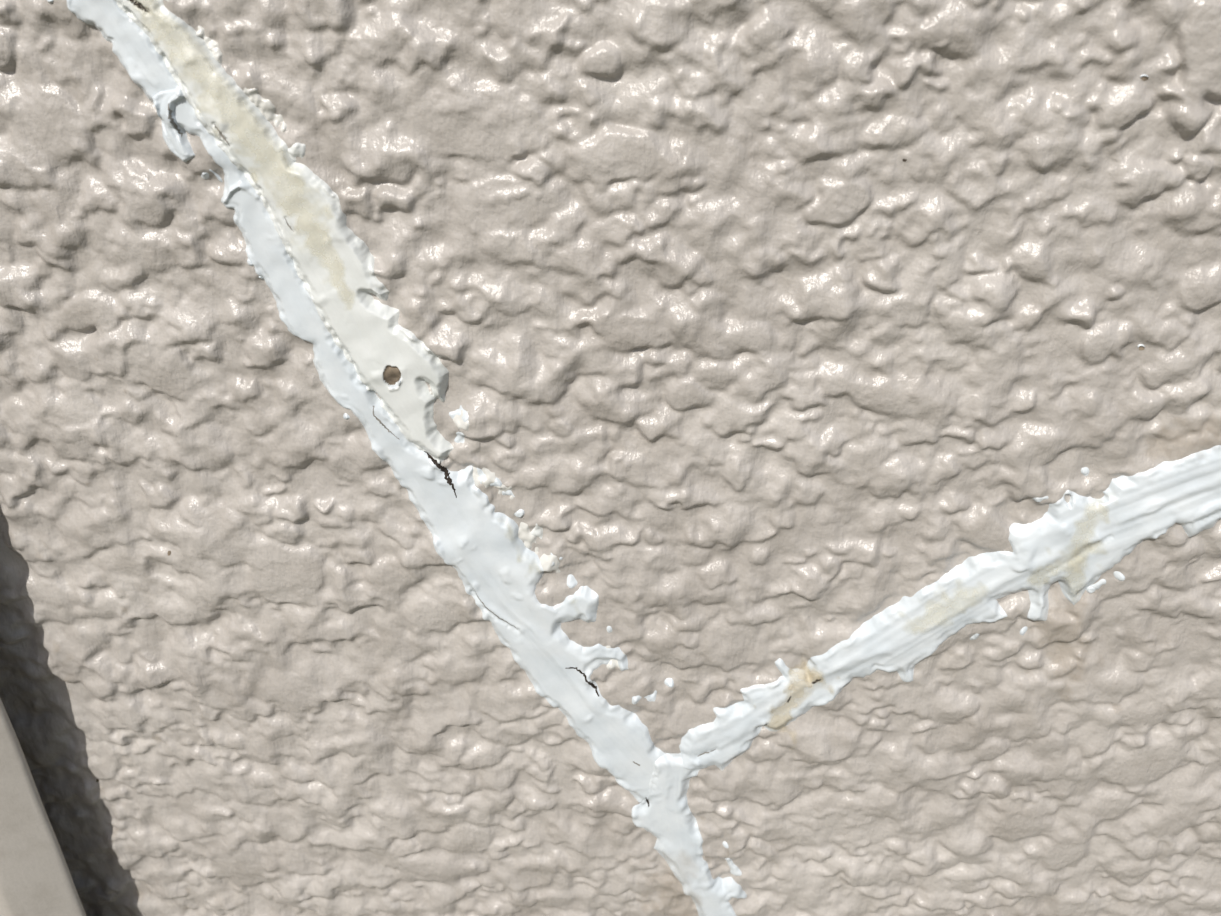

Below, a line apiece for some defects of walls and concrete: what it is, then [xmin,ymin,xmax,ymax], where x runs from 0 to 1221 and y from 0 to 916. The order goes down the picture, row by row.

crack [67,0,665,803]
crack [632,445,1221,916]